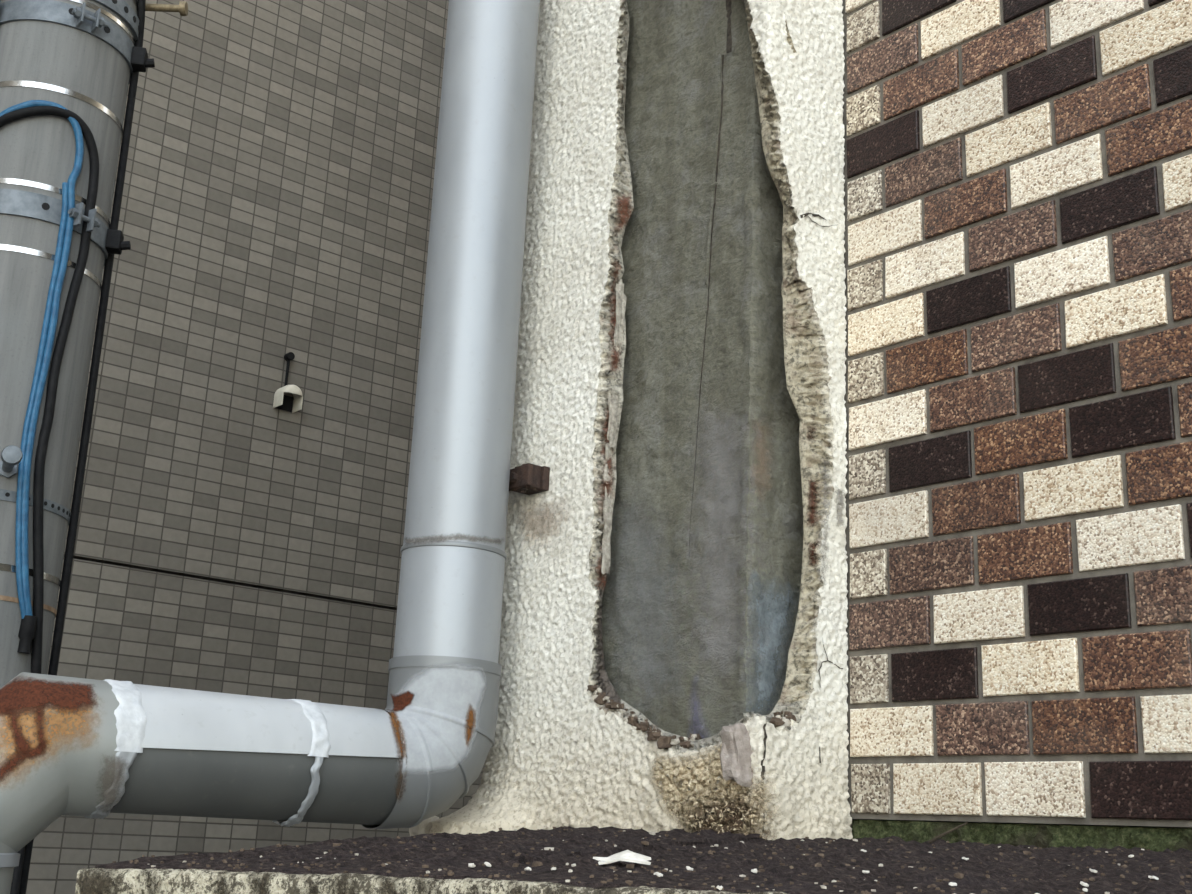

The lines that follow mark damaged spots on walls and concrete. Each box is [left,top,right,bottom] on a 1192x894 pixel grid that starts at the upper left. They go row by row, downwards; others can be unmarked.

rust [616,195,633,231]
crack [689,0,732,557]
rust [610,298,620,370]
flaking render [587,0,844,836]
crack [759,723,767,831]